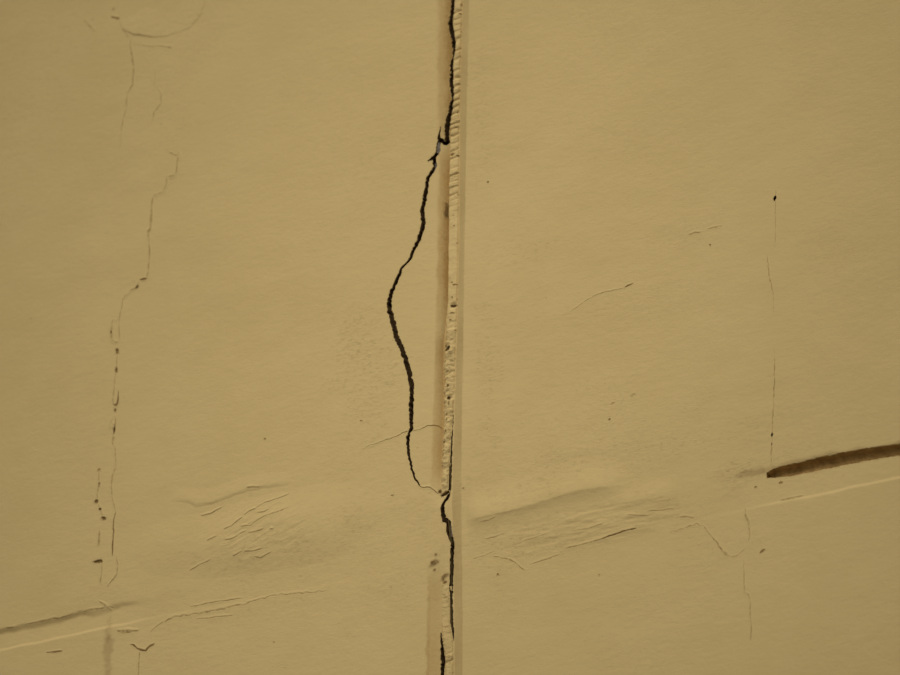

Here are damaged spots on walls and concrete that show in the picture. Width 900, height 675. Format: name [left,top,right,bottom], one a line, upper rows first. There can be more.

crack [107,149,182,587]
crack [362,0,456,675]